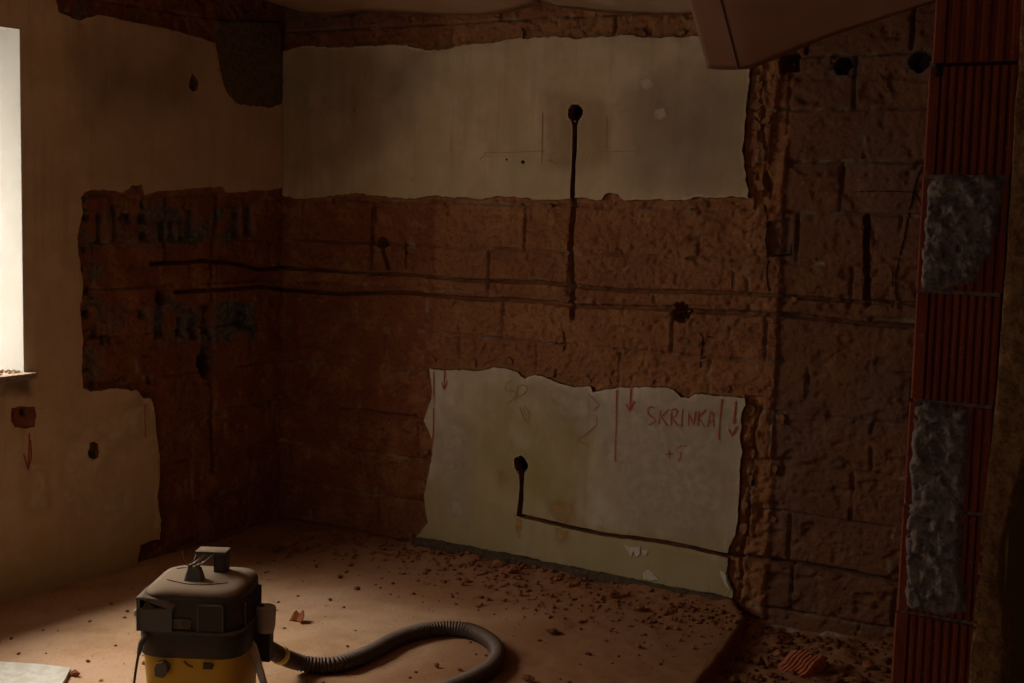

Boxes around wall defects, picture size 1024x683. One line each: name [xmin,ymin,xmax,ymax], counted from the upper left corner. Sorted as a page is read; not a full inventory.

spalling [56,0,698,60]
hole [908,52,941,77]
spalling [77,53,801,620]
spalling [11,406,35,428]